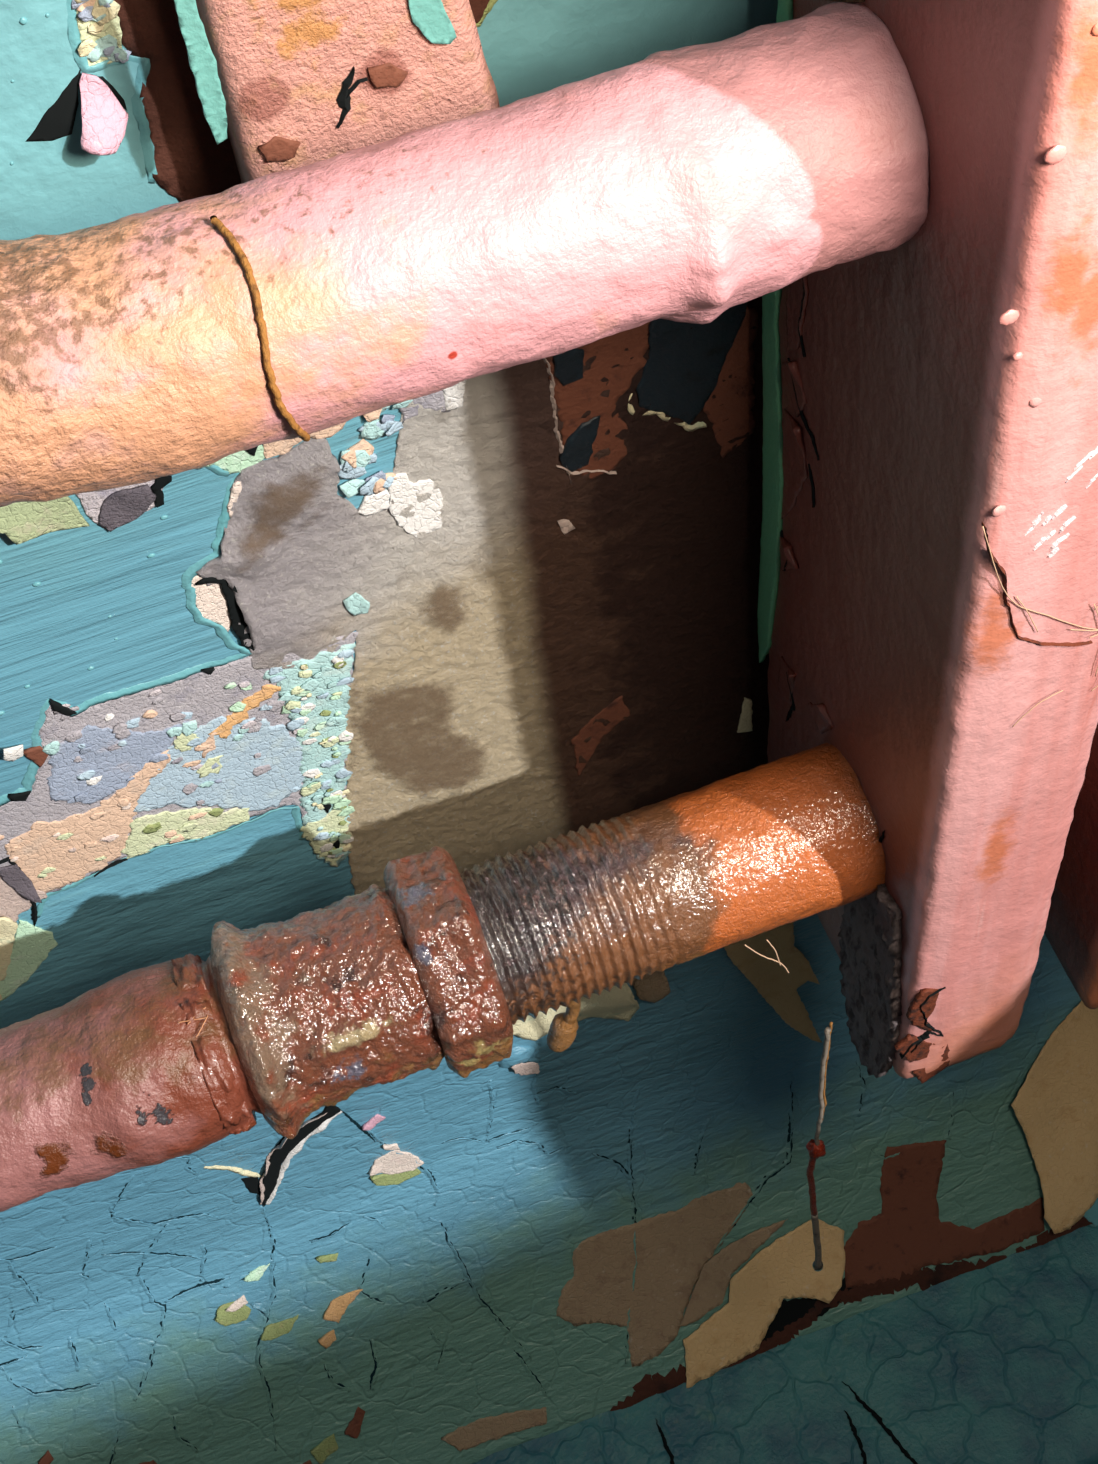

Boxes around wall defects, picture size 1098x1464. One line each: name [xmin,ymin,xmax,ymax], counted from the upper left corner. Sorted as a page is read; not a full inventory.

flaking render [25,0,242,202]
damp [248,481,319,550]
flaking render [0,296,770,1001]
damp [362,686,482,792]
peeling [1011,1000,1098,1234]
crack [0,1074,687,1464]
peeling [556,1182,853,1388]